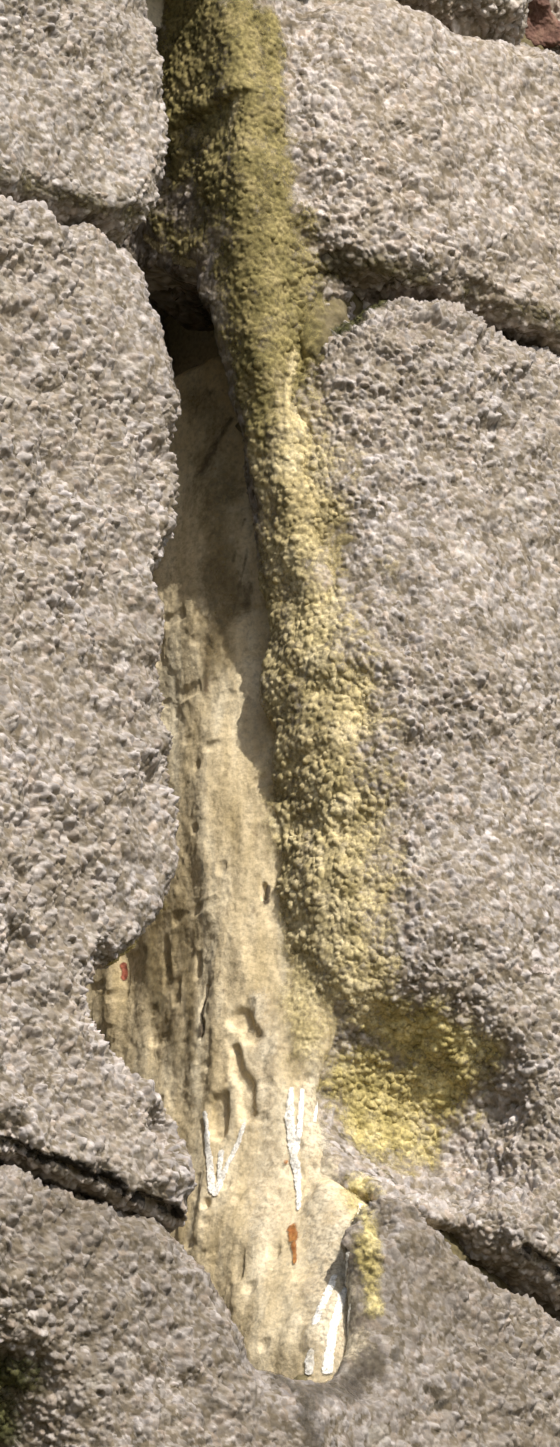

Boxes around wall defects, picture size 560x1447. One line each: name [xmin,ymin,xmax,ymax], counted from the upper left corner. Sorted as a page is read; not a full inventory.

damp [255,8,301,247]
damp [283,346,298,431]
damp [248,431,269,513]
spalling [198,1001,206,1037]
crack [1,1135,185,1218]
crack [519,1246,560,1284]